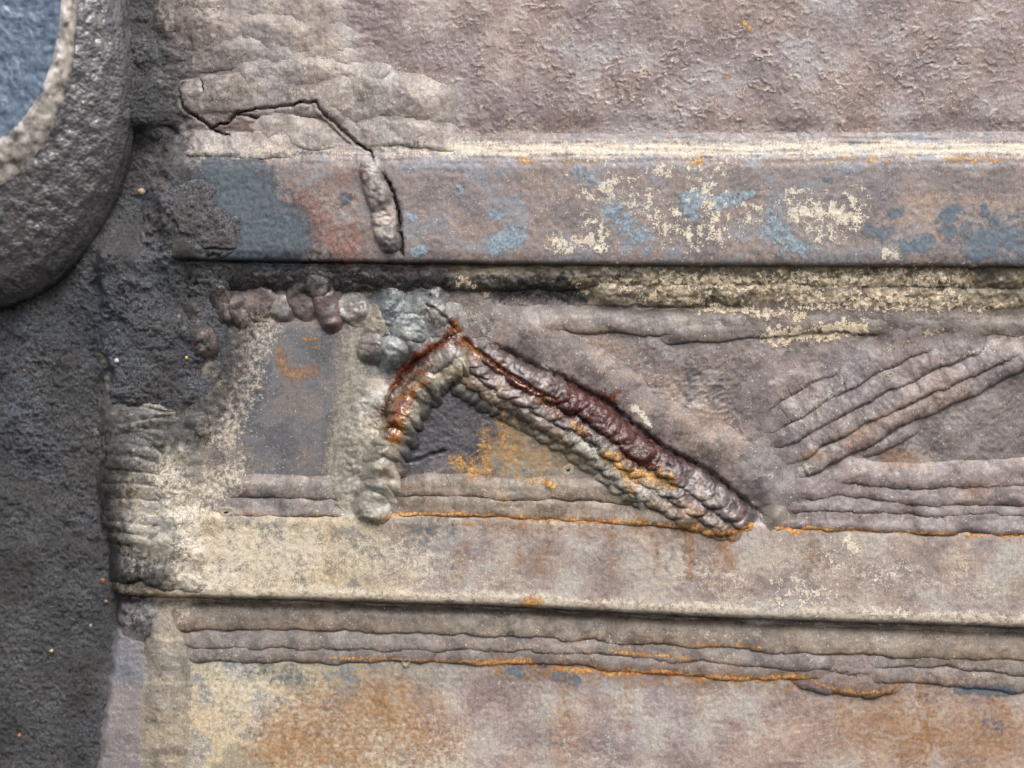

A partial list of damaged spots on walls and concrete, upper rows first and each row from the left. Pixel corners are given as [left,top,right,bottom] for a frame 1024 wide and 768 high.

crack [177,78,404,255]
rust [289,166,369,268]
peeling [409,244,428,258]
peeling [484,209,528,259]
peeling [544,150,1024,273]
rust [382,318,696,495]
rust [370,491,754,578]
rust [774,525,1024,538]
rust [333,650,902,701]